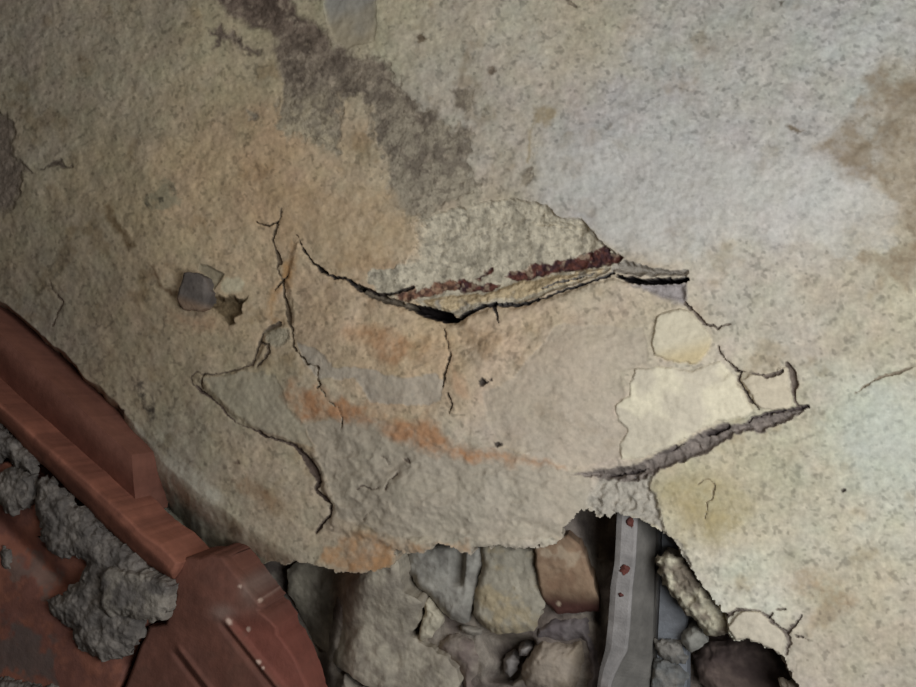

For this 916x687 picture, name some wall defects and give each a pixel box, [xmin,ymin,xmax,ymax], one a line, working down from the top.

flaking render [198,263,249,326]
peeling [207,0,793,460]
crack [190,207,810,534]
rust [395,245,624,302]
water stain [810,49,916,294]
crack [854,366,914,394]
flaking render [586,476,787,655]